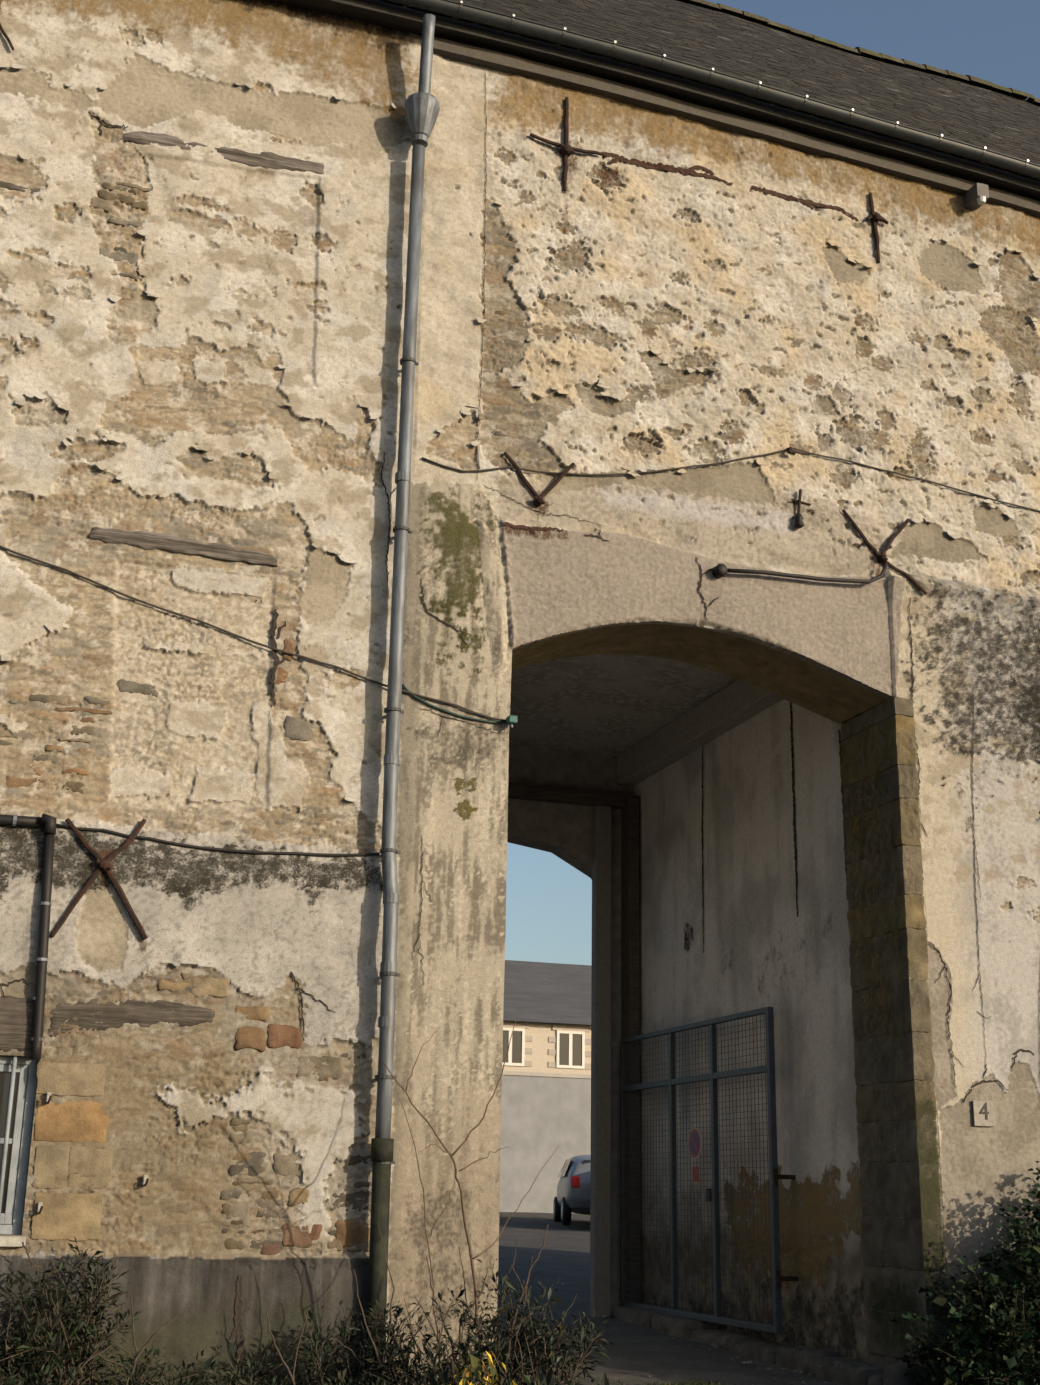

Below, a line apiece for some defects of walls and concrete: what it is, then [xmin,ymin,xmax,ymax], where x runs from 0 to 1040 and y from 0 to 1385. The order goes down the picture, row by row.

flaking render [0,28,412,854]